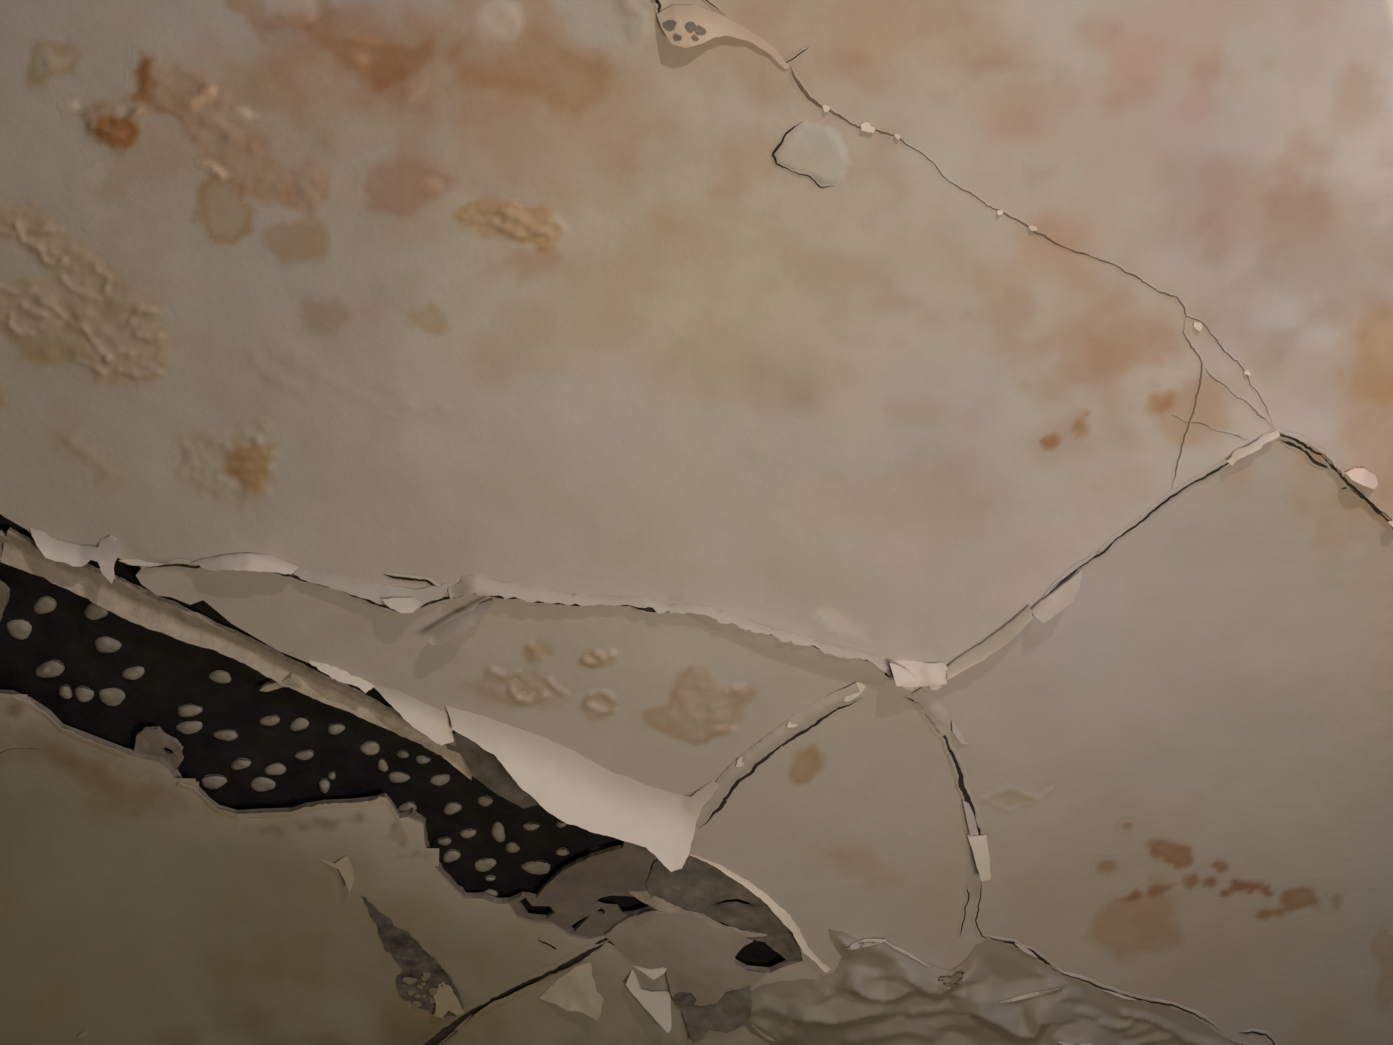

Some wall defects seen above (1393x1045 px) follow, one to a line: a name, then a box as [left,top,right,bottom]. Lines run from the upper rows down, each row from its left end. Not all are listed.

water stain [16,29,90,103]
water stain [216,0,638,126]
peeling [651,0,810,69]
water stain [351,140,466,233]
peeling [770,121,834,190]
water stain [185,167,358,348]
crack [145,66,1393,836]
water stain [1133,360,1248,457]
flaking render [0,514,1241,1045]
rust [1074,818,1347,974]
crack [415,935,618,1045]
crack [1230,1028,1279,1045]